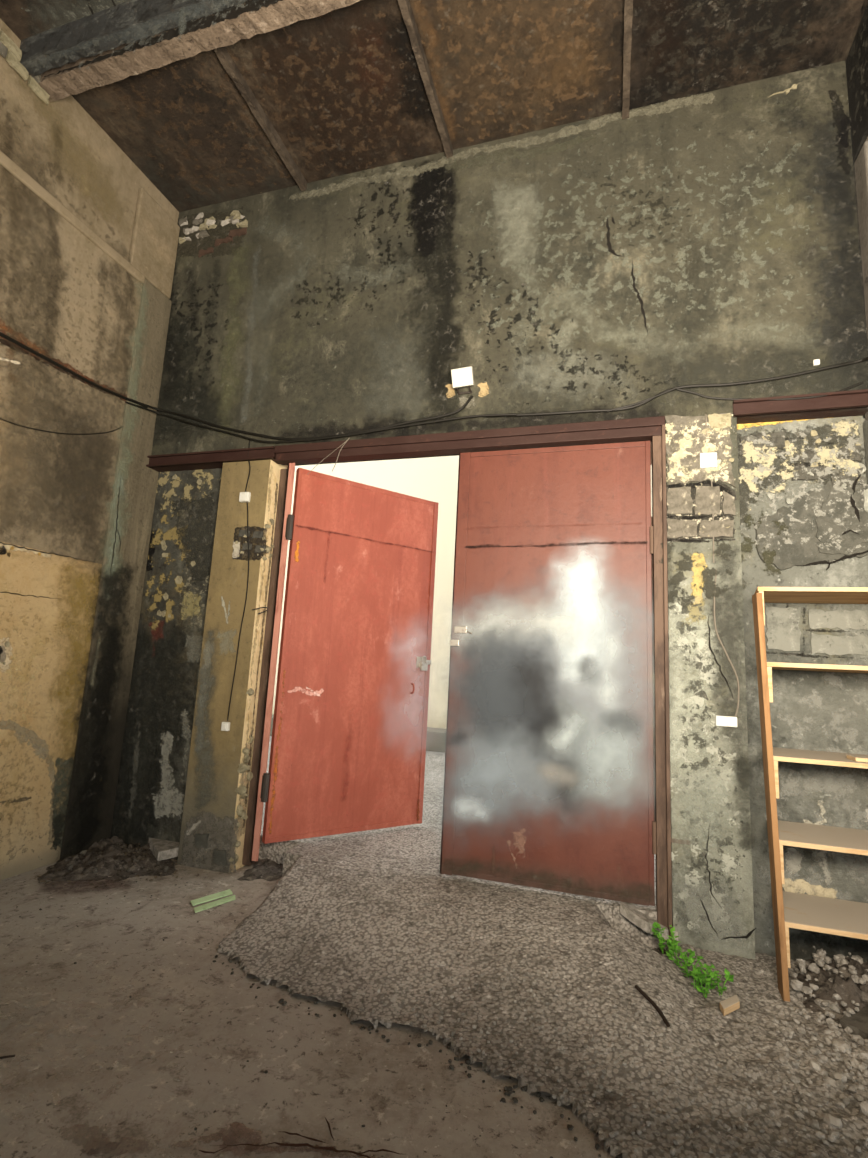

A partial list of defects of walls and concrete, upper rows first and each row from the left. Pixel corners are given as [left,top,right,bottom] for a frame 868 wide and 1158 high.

flaking render [176,208,248,258]
damp [155,0,868,443]
crack [606,217,648,333]
damp [0,104,216,853]
peeling [145,469,222,631]
flaking render [660,413,868,609]
crack [801,474,868,570]
crack [707,616,733,698]
crack [700,821,756,940]